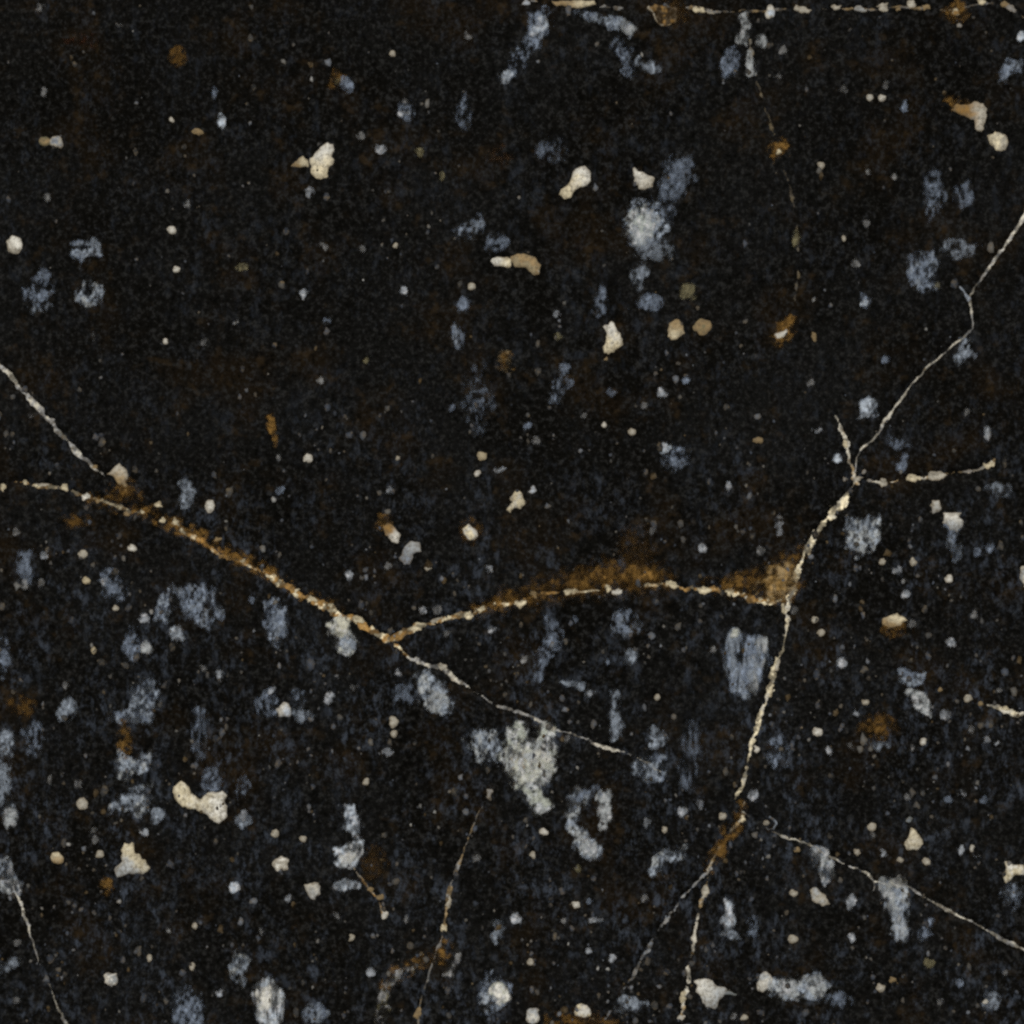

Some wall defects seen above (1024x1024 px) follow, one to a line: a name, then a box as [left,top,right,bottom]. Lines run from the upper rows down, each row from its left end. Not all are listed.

crack [522,0,623,11]
crack [685,0,1024,135]
crack [783,170,800,327]
crack [0,214,1024,1024]
corrosion [717,546,801,603]